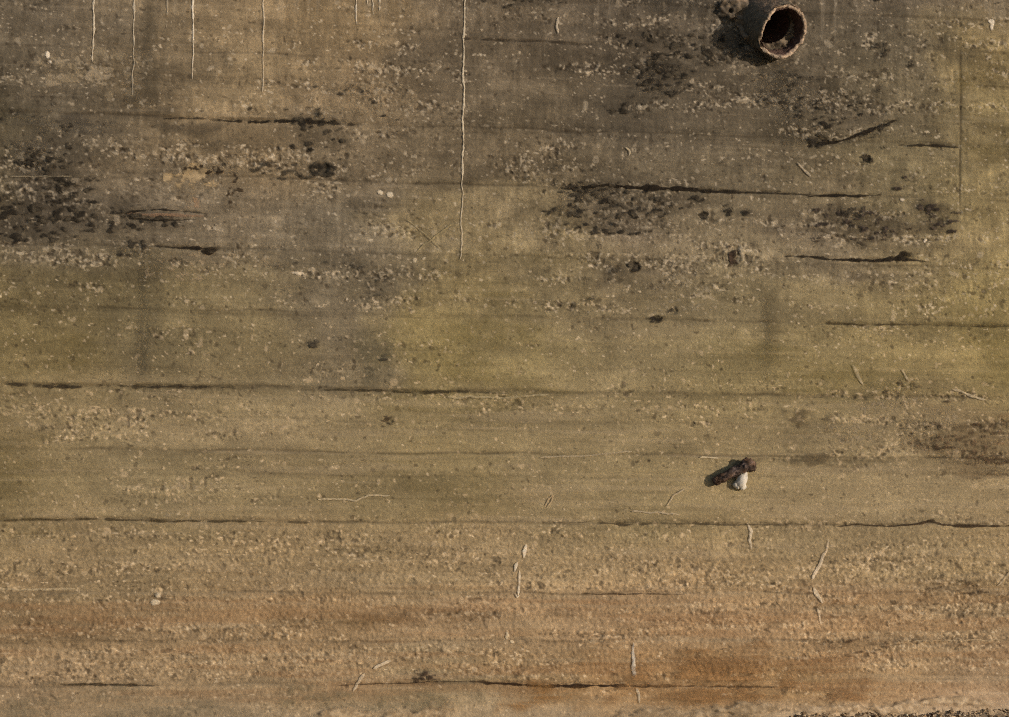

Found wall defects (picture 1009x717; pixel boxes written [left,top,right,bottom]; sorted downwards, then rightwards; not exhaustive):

rust [712,457,757,491]